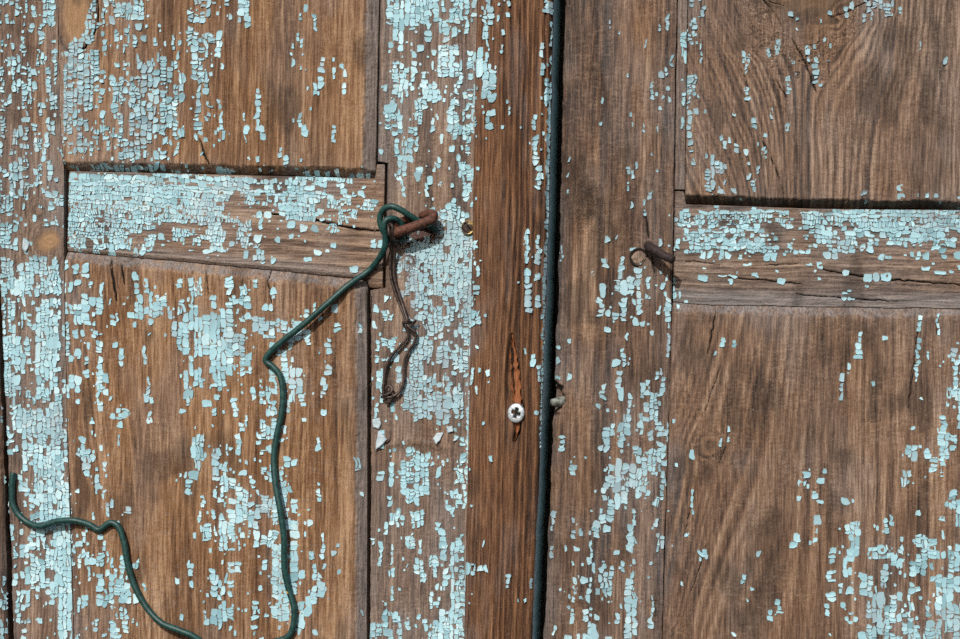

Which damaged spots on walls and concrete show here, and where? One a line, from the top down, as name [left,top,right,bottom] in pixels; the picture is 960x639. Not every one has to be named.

crack [764,0,816,90]
peeling [650,0,960,285]
peeling [358,0,511,639]
peeling [517,0,553,448]
peeling [549,247,688,639]
peeling [767,599,784,621]
peeling [789,469,827,548]
peeling [839,332,863,400]
peeling [863,272,891,288]
peeling [824,489,960,639]
peeling [913,315,929,382]
peeling [900,342,960,487]